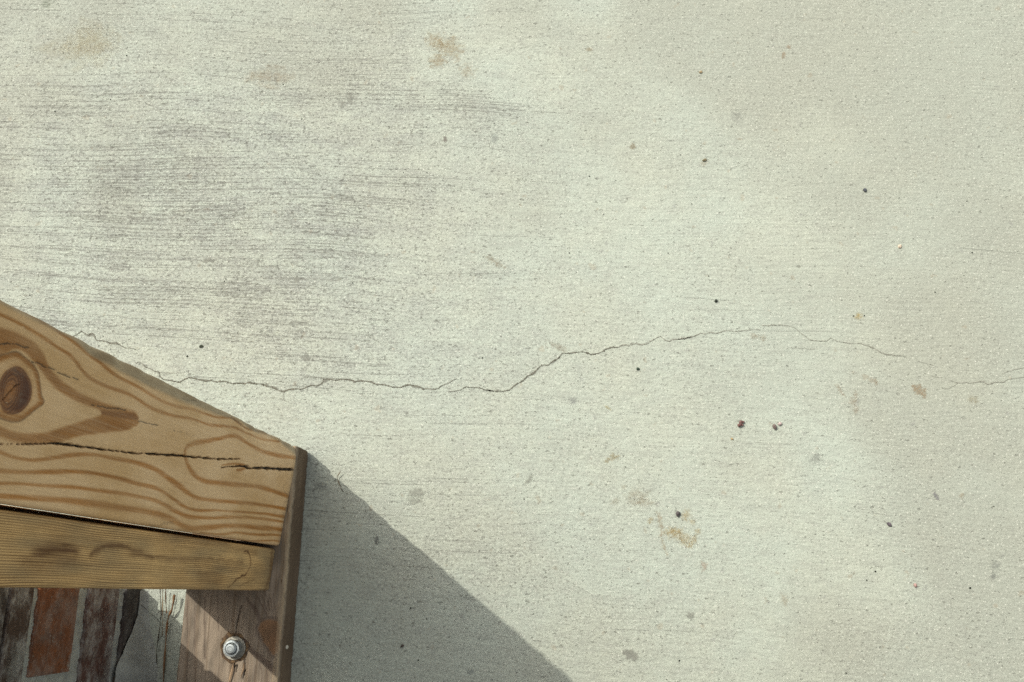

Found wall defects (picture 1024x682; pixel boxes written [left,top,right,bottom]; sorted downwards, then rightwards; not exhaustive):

crack [73,324,901,403]
crack [930,364,1021,389]